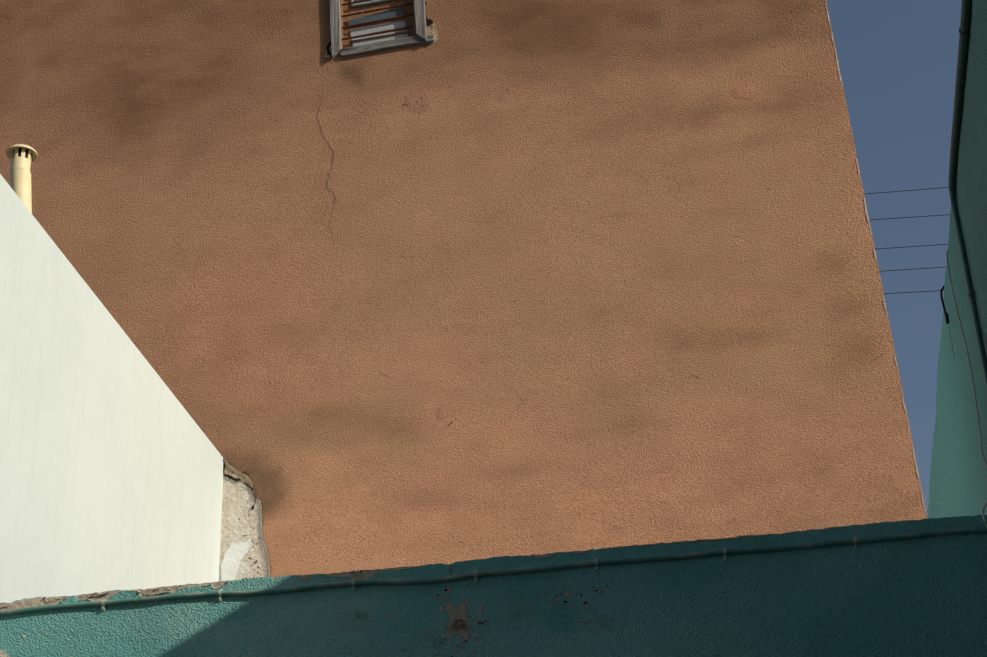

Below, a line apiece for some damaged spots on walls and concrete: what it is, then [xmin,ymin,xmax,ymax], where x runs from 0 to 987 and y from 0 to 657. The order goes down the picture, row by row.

spalling [0,458,277,610]
peeling [426,586,487,657]